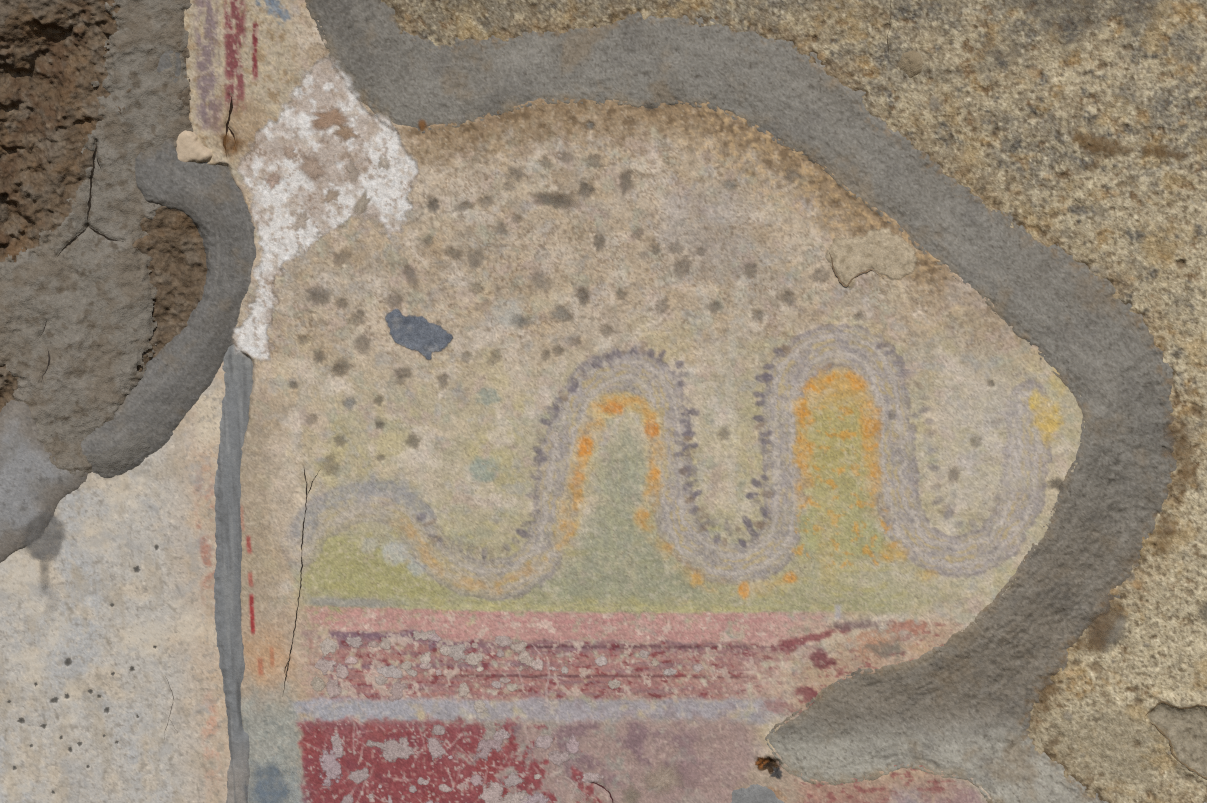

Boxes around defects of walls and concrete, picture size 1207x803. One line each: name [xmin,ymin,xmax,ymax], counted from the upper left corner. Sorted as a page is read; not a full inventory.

spalling [176,130,212,163]
crack [59,145,124,254]
spalling [826,228,917,288]
crack [282,469,320,697]
peeling [311,636,391,698]
peeling [375,630,568,701]
peeling [319,734,392,803]
peeling [366,724,453,762]
peeling [409,777,453,803]
peeling [470,729,549,803]
peeling [535,734,579,766]
spalling [1145,701,1207,779]